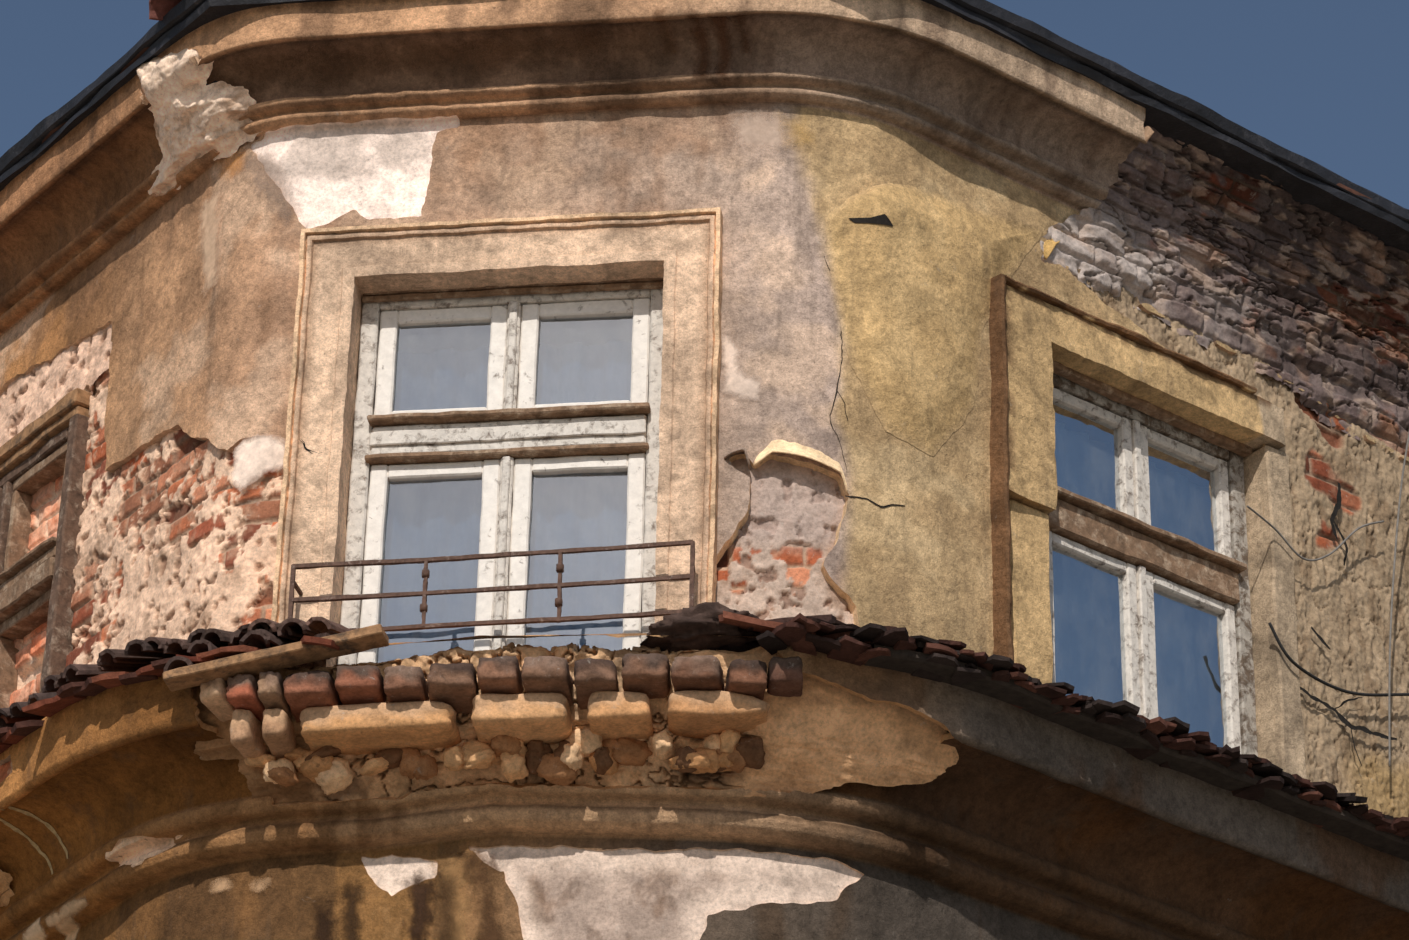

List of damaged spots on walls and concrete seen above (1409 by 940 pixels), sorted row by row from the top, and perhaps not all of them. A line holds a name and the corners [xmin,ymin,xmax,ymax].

peeling [242,115,460,229]
spalling [1144,108,1154,142]
peeling [1043,239,1060,260]
crack [830,331,905,508]
spalling [0,321,285,666]
spalling [716,439,860,627]
spalling [1066,267,1409,818]
flaking render [190,652,954,743]
water stain [315,884,364,940]
peeling [361,854,438,896]
water stain [411,852,502,940]
peeling [469,845,864,940]